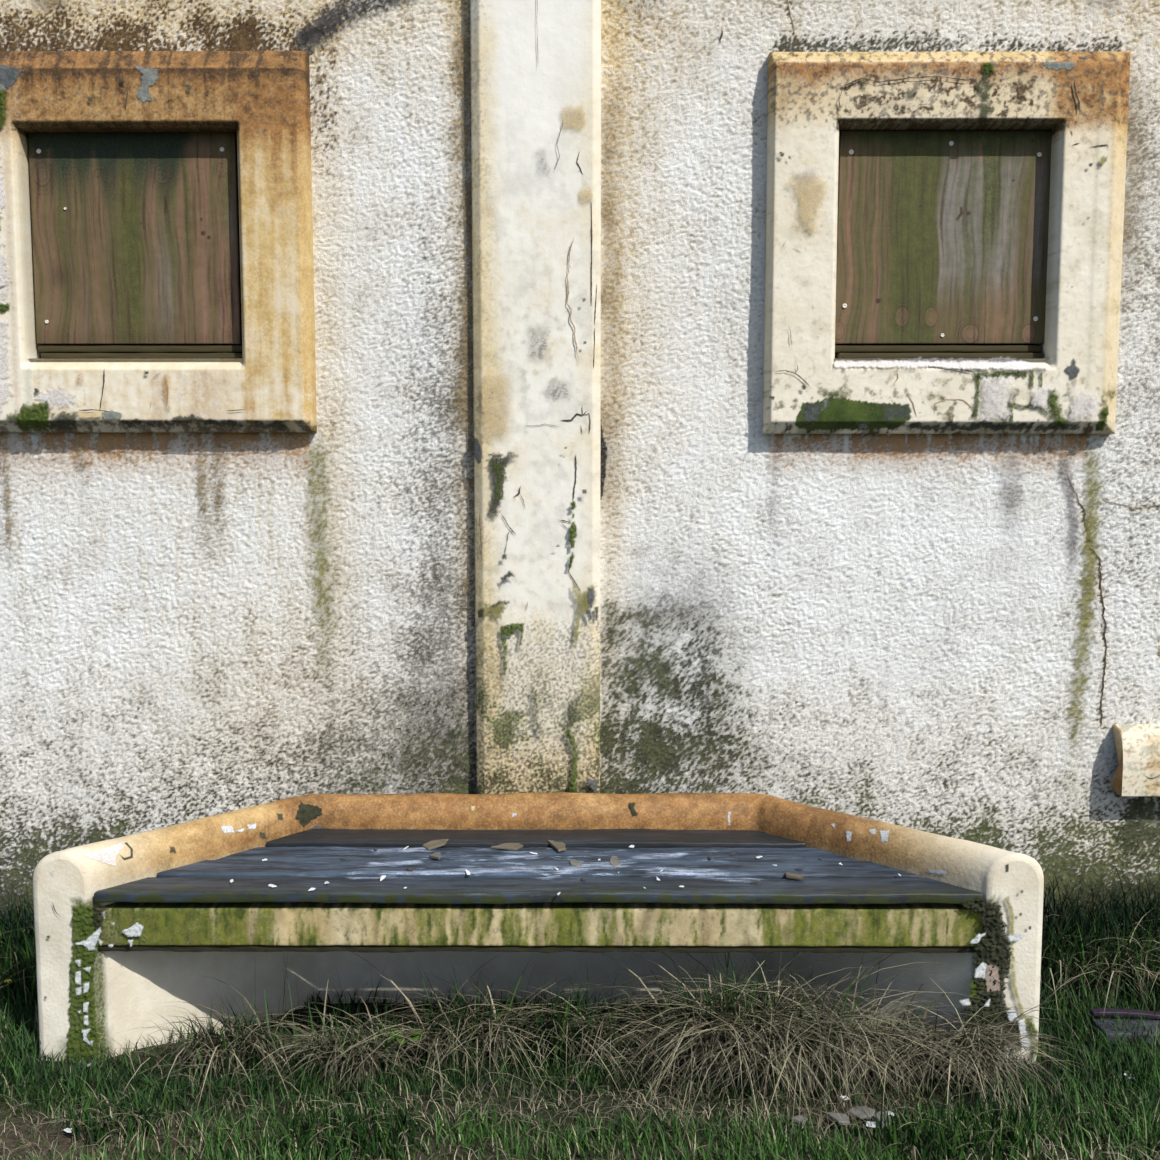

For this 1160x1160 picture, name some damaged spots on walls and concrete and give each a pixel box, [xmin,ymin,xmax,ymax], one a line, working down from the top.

spalling [0,65,25,91]
peeling [34,387,122,420]
peeling [834,357,1048,422]
peeling [1065,358,1101,420]
spalling [473,437,482,464]
leakage [1059,460,1079,559]
spalling [586,588,598,621]
crack [1066,473,1158,725]
spalling [960,897,1031,1049]